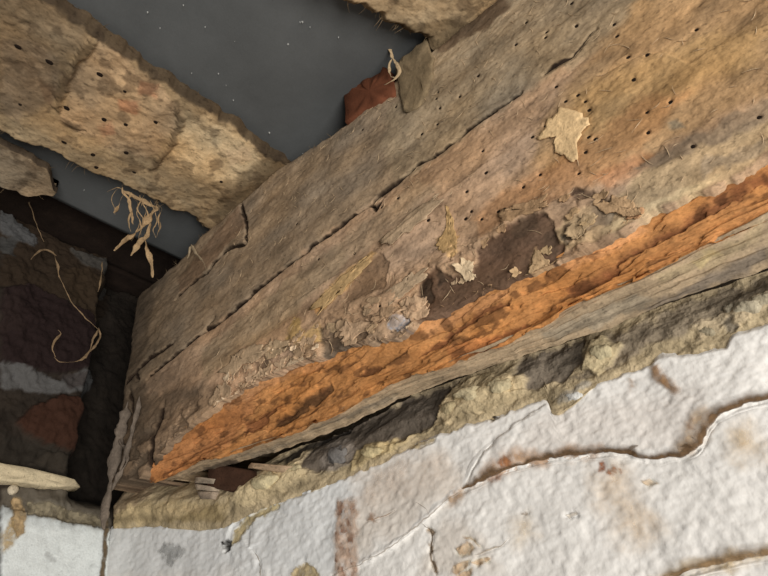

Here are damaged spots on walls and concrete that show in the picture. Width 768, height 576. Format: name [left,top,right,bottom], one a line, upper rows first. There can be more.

peeling [536,107,590,162]
crack [127,96,519,412]
peeling [379,193,477,286]
peeling [509,245,557,278]
peeling [559,188,645,240]
peeling [208,255,430,407]
crack [148,408,165,468]
crack [448,393,768,499]
crack [410,503,435,567]
crack [664,548,768,576]